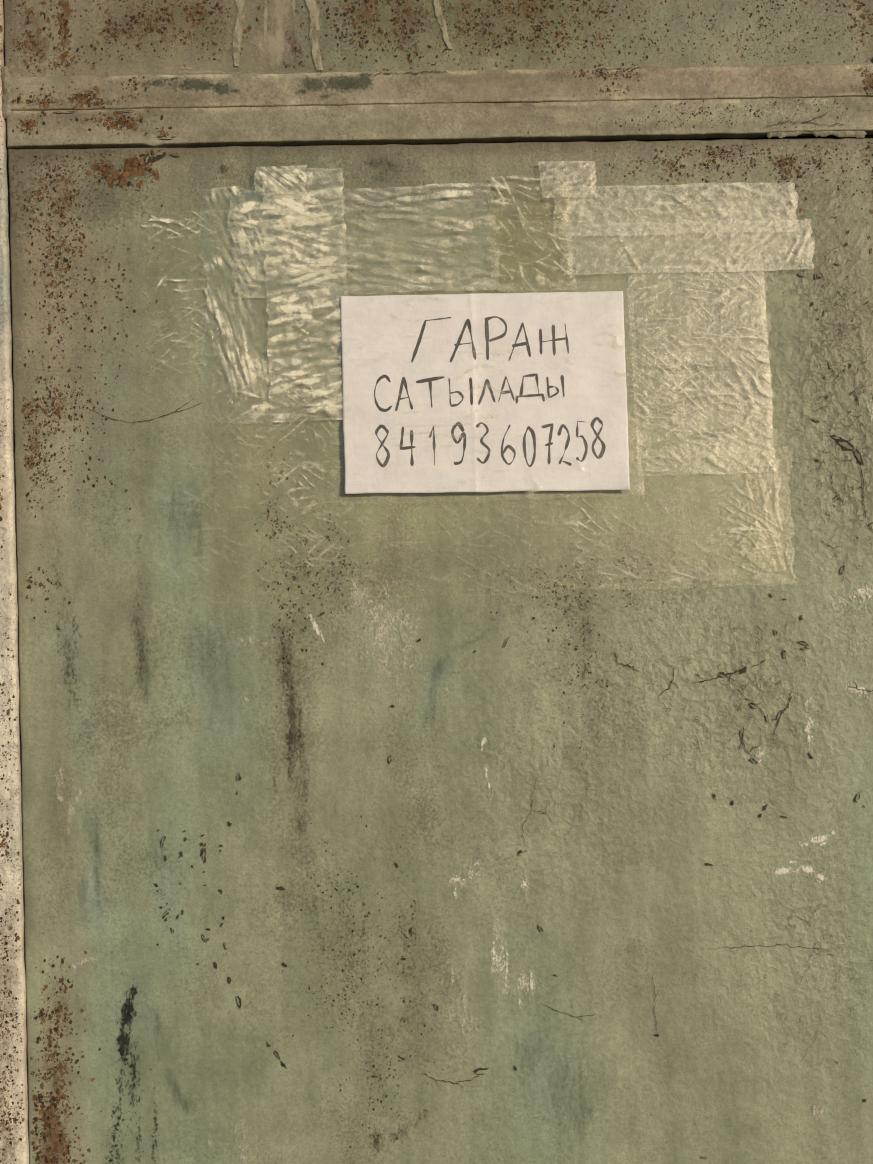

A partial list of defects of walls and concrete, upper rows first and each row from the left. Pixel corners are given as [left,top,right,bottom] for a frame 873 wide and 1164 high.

rust [0,0,873,139]
rust [586,141,873,214]
rust [0,150,169,518]
crack [831,465,873,530]
rust [0,560,71,658]
crack [658,659,793,765]
rust [0,674,102,1164]
crack [709,905,833,973]
leakage [106,986,158,1164]